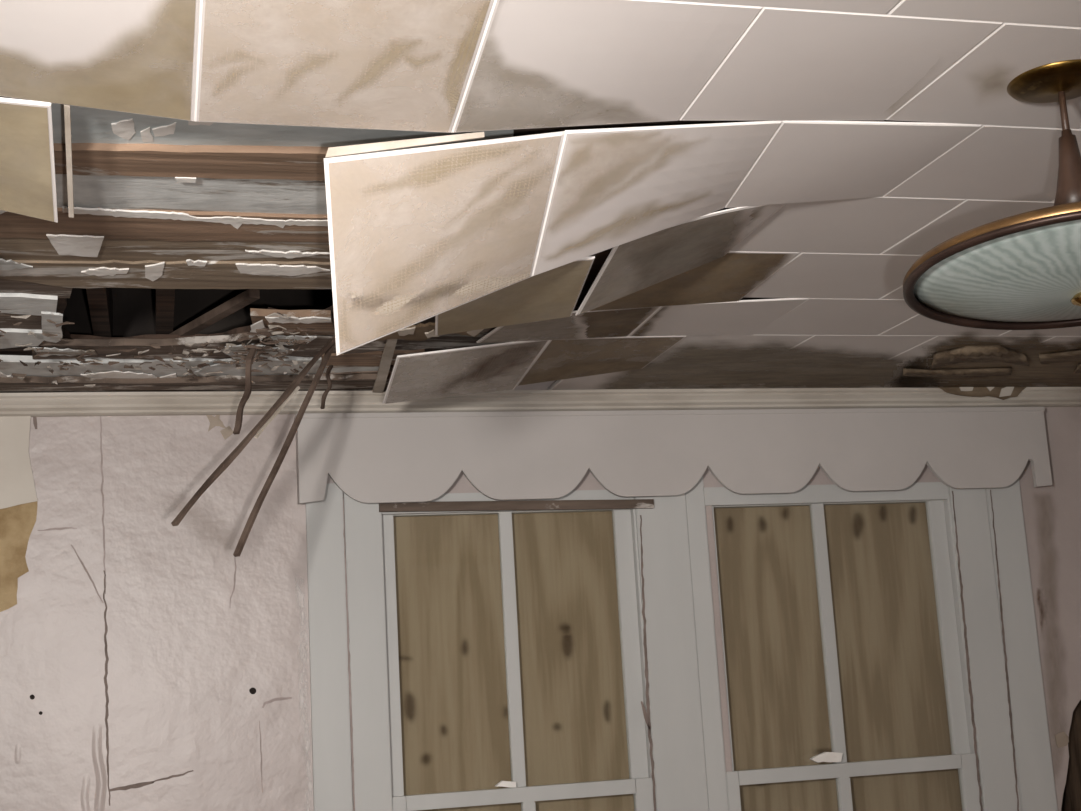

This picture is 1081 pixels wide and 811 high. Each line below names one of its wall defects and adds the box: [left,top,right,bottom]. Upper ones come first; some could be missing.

leakage [0,0,298,222]
leakage [428,3,621,146]
spalling [46,234,129,276]
peeling [63,207,328,229]
peeling [236,250,330,276]
leakage [337,228,428,349]
leakage [408,144,502,200]
leakage [388,160,1081,401]
peeling [194,316,331,376]
flaking render [0,501,37,612]
crack [38,416,193,806]
spalling [1055,700,1081,811]